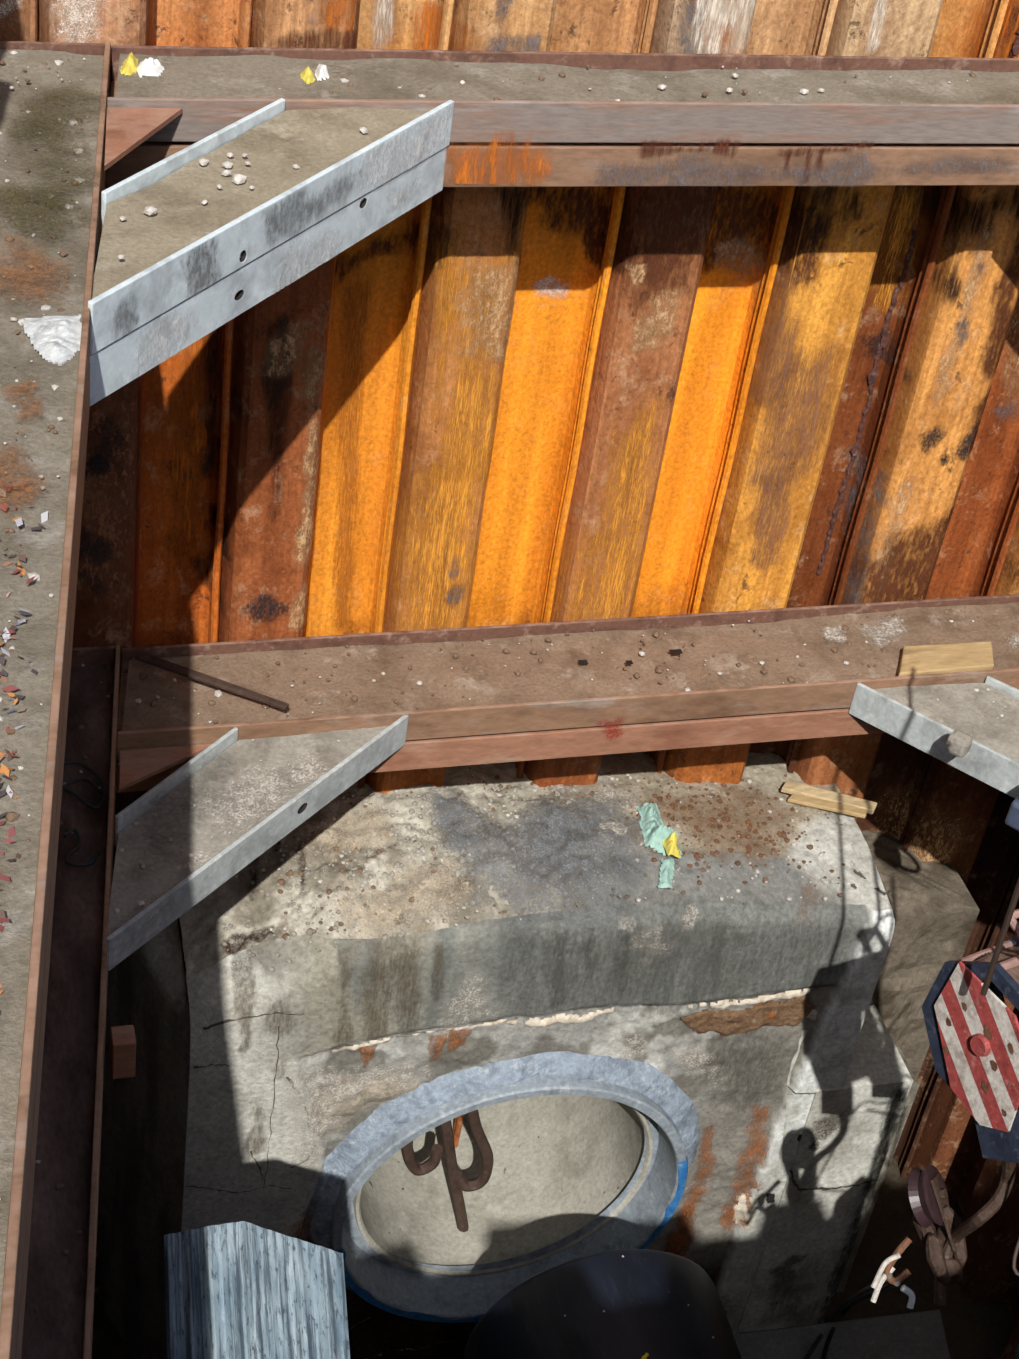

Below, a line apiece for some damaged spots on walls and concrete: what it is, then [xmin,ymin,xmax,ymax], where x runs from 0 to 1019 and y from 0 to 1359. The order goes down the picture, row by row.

rust [963,0,1019,58]
rust [262,315,293,459]
rust [335,215,516,631]
rust [449,137,872,570]
rust [816,187,932,575]
rust [554,404,656,621]
damp [436,950,496,1027]
spalling [681,988,818,1037]
crack [186,1012,316,1193]
rust [666,1127,714,1256]
rust [721,1107,768,1230]
crack [789,1170,882,1191]